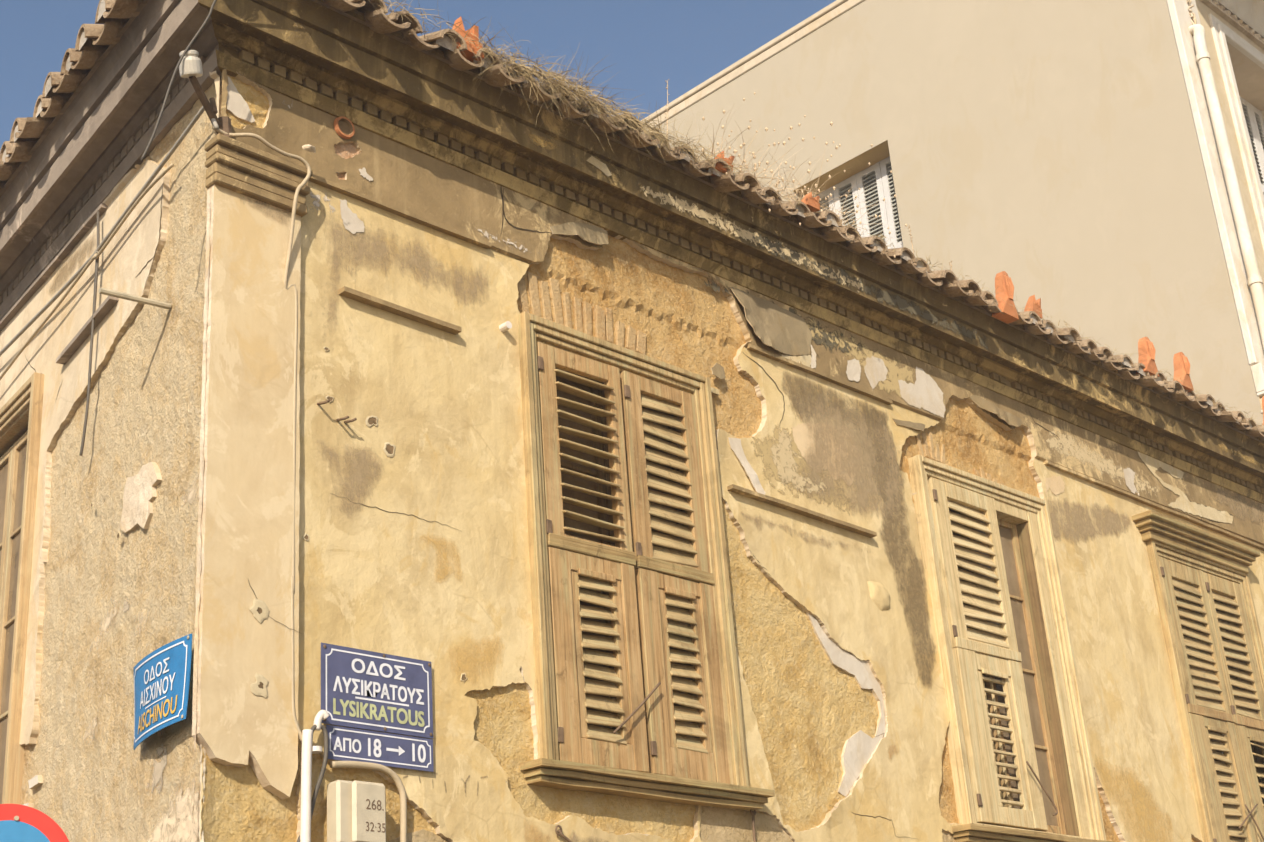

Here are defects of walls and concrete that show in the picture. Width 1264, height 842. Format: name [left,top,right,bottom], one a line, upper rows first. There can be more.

peeling [587,156,612,176]
crack [135,186,163,288]
damp [333,227,485,301]
peeling [642,186,873,289]
flaking render [477,222,1233,524]
flaking render [20,73,453,842]
damp [783,374,935,685]
damp [1050,502,1129,540]
flaking render [460,497,888,842]